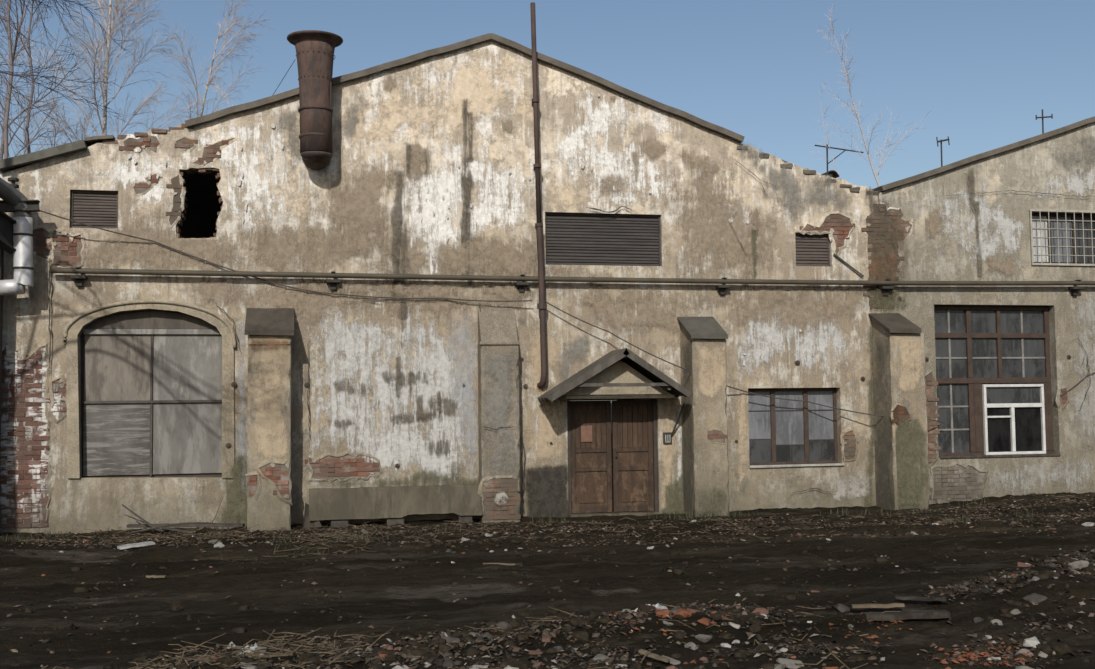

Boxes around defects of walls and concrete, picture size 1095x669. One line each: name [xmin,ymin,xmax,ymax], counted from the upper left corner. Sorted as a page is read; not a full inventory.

spalling [33,224,87,268]
peeling [105,122,305,239]
leakage [85,100,569,324]
spalling [797,201,913,312]
spalling [0,340,67,530]
flaking render [245,365,293,505]
peeling [305,304,473,485]
spalling [478,475,521,521]
spalling [891,403,911,428]
spalling [899,340,988,504]